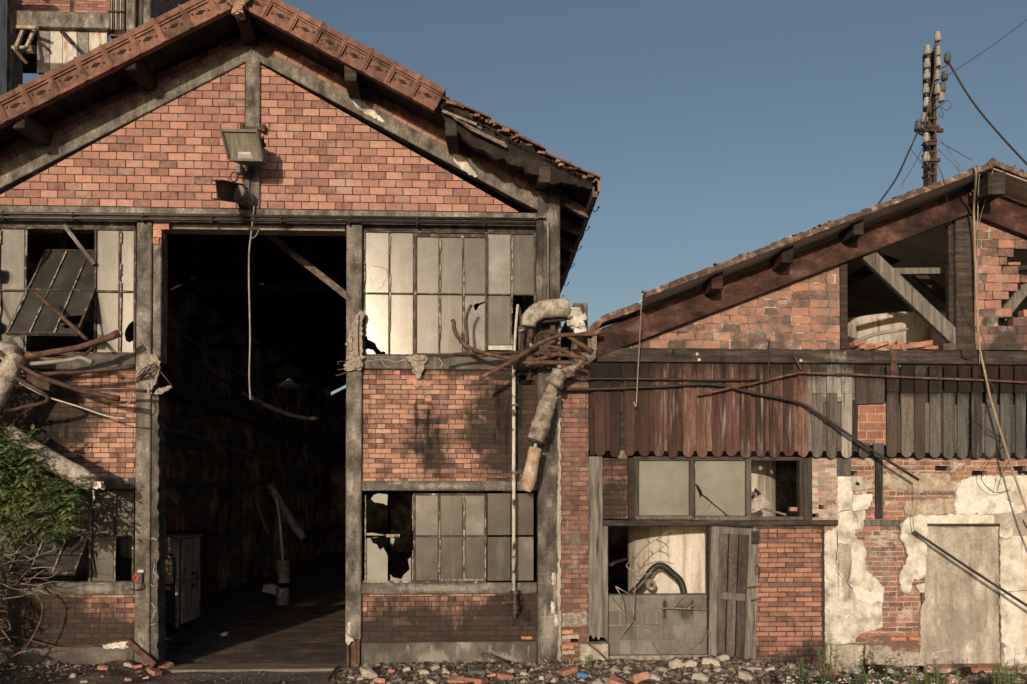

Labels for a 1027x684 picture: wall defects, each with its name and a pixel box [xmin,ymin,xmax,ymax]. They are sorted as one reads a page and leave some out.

flaking render [824,472,1027,667]